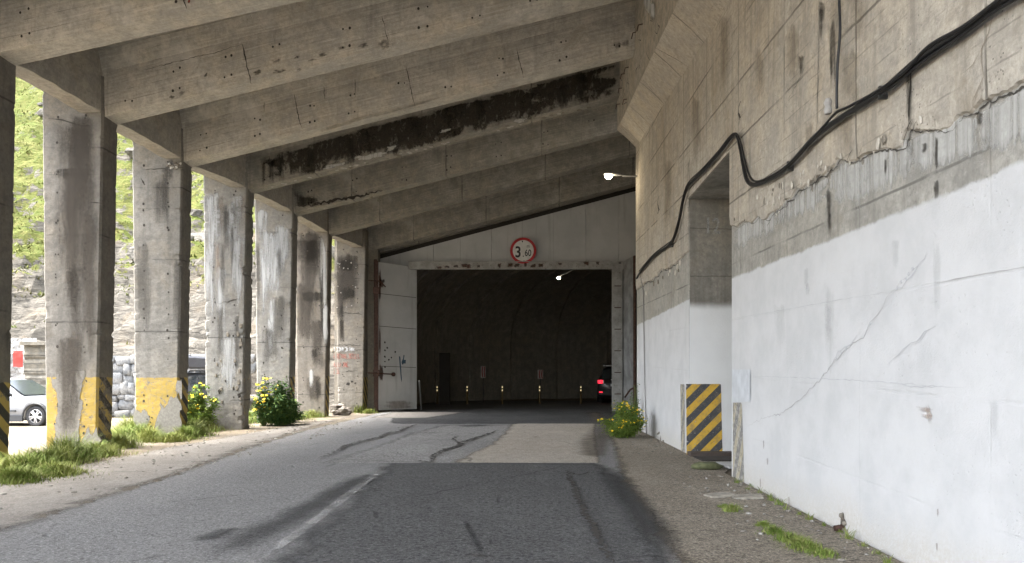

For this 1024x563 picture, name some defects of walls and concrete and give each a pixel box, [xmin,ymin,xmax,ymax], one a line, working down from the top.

crack [145,44,251,82]
peeling [734,86,1024,228]
spalling [297,190,382,207]
damp [205,193,244,387]
damp [255,210,357,399]
crack [737,255,960,422]
crack [940,267,1022,283]
peeling [51,370,101,446]
peeling [133,381,182,437]